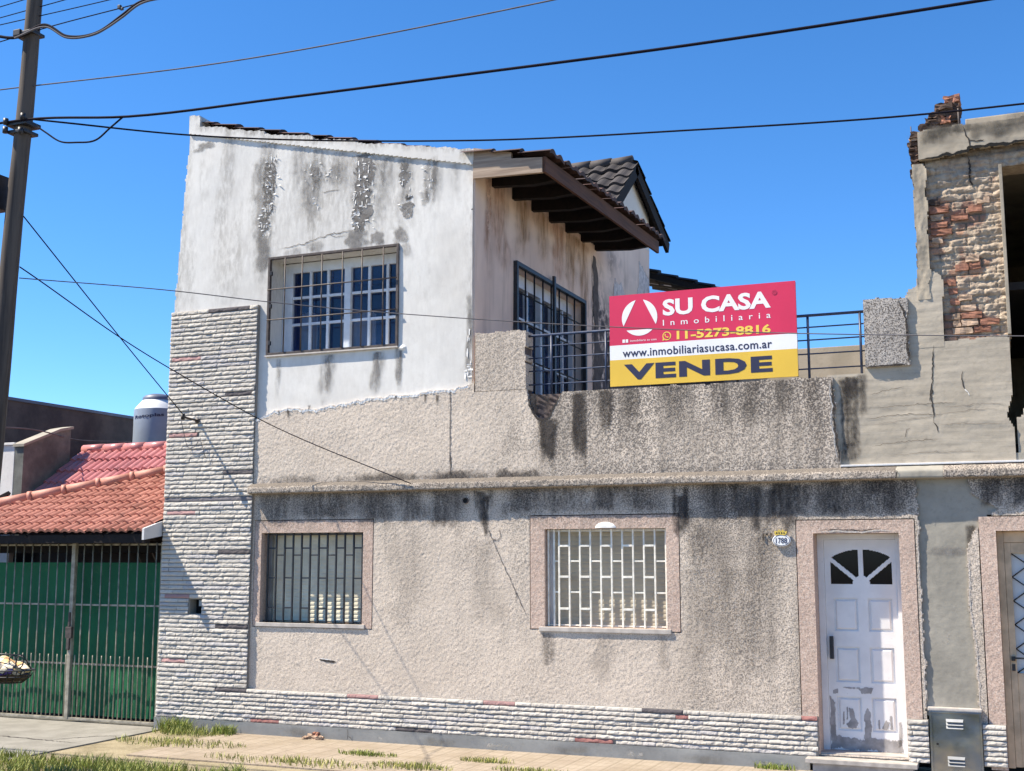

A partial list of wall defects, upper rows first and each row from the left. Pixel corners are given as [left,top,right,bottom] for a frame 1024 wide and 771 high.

crack [921,127,1024,187]
peeling [255,155,281,269]
peeling [351,153,376,232]
flaking render [929,196,990,244]
flaking render [948,255,1000,334]
damp [539,419,556,458]
damp [572,394,587,454]
crack [871,347,999,455]
damp [356,471,478,525]
damp [673,488,688,532]
crack [490,535,528,618]
peeling [829,687,904,753]